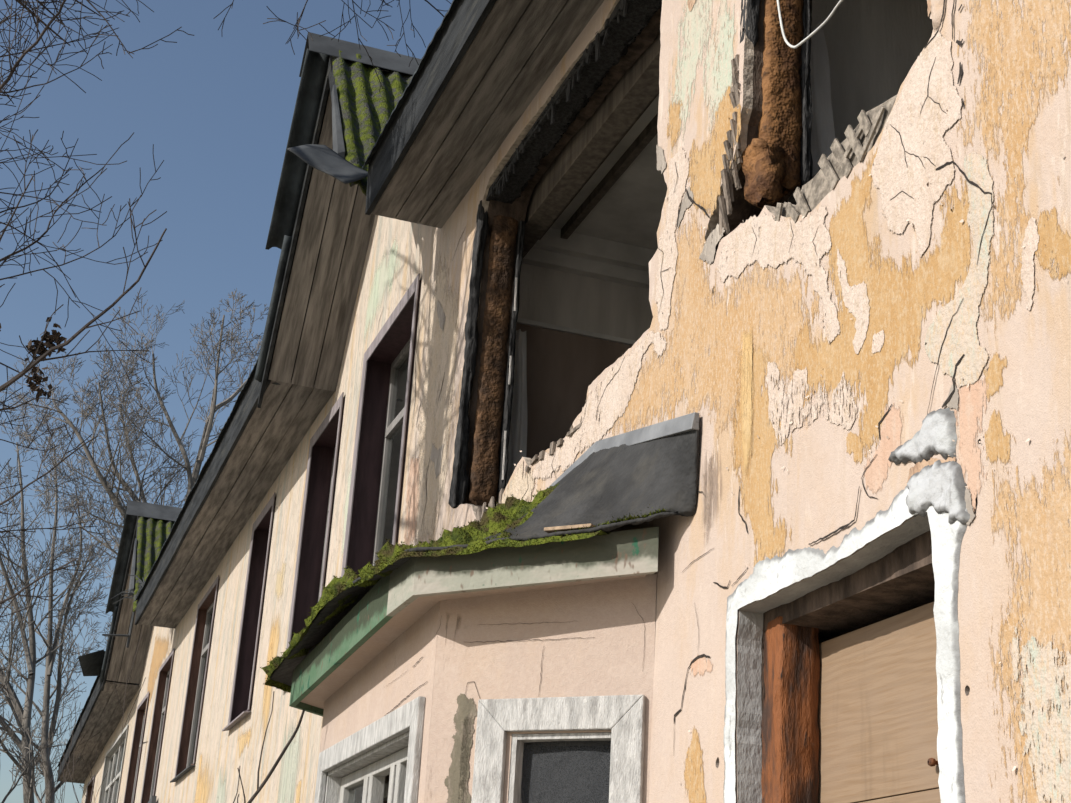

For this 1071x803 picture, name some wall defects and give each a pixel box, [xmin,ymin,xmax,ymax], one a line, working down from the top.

crack [920,0,963,113]
crack [891,126,992,262]
peeling [401,250,462,545]
peeling [482,0,1071,803]
crack [927,299,964,414]
crack [809,404,892,545]
crack [673,610,710,752]